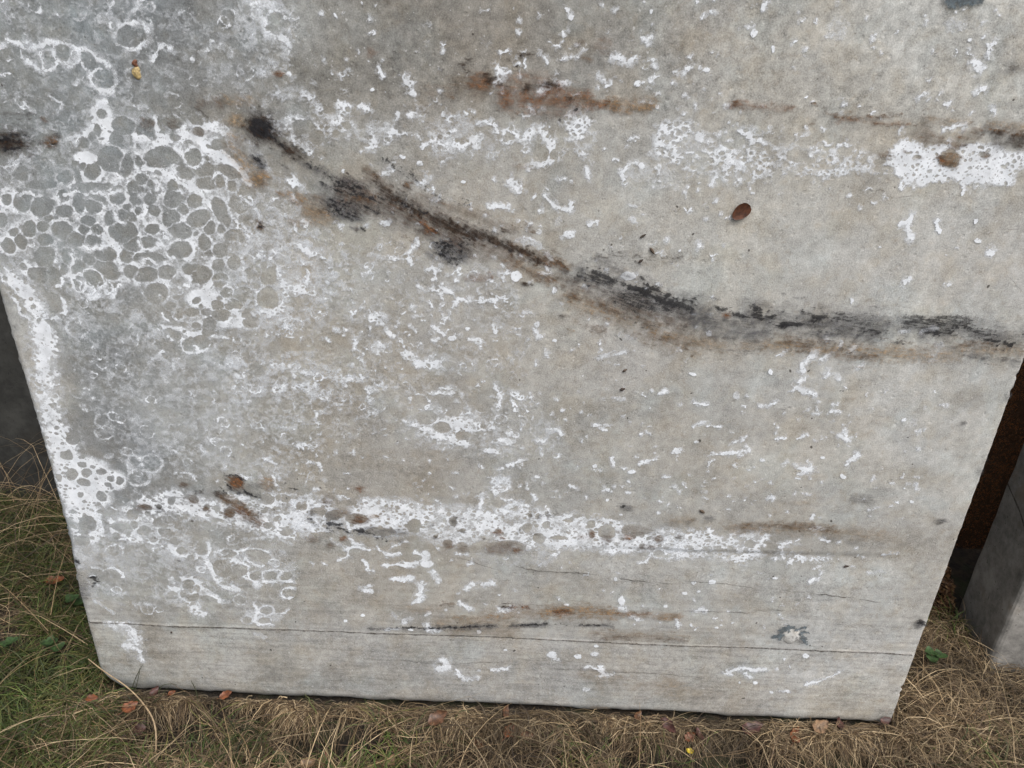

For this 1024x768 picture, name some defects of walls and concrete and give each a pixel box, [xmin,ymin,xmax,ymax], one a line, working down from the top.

rust [459,58,496,88]
rust [500,79,655,112]
water stain [240,106,1024,368]
rust [189,474,298,523]
water stain [307,511,393,546]